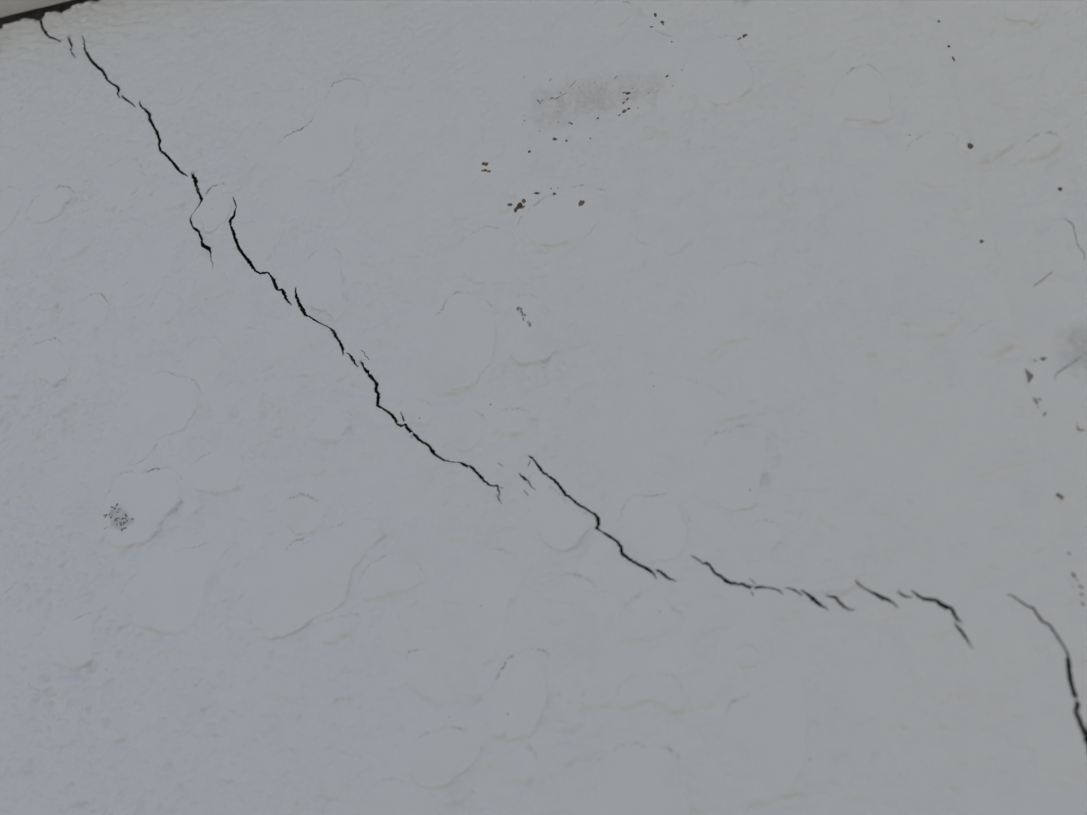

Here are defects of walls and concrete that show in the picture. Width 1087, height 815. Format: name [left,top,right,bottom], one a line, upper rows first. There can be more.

crack [36,18,677,583]
crack [691,555,974,648]
crack [1007,593,1087,758]